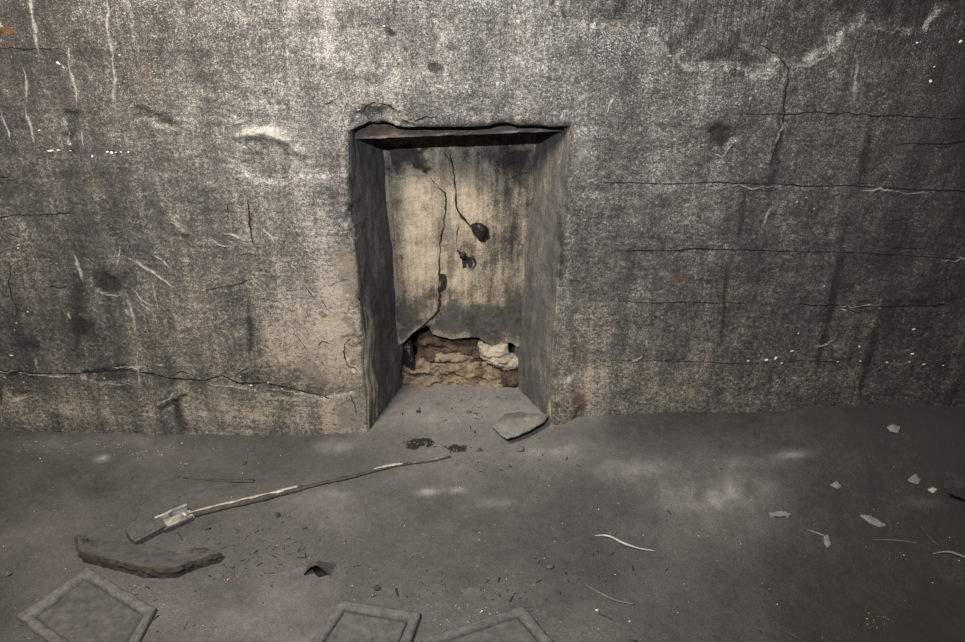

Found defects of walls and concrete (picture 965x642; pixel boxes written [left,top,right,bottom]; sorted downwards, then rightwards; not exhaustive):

crack [605,45,965,194]
crack [394,153,471,329]
crack [621,244,965,262]
crack [0,367,327,399]
crack [299,339,360,370]
spalling [402,327,519,388]